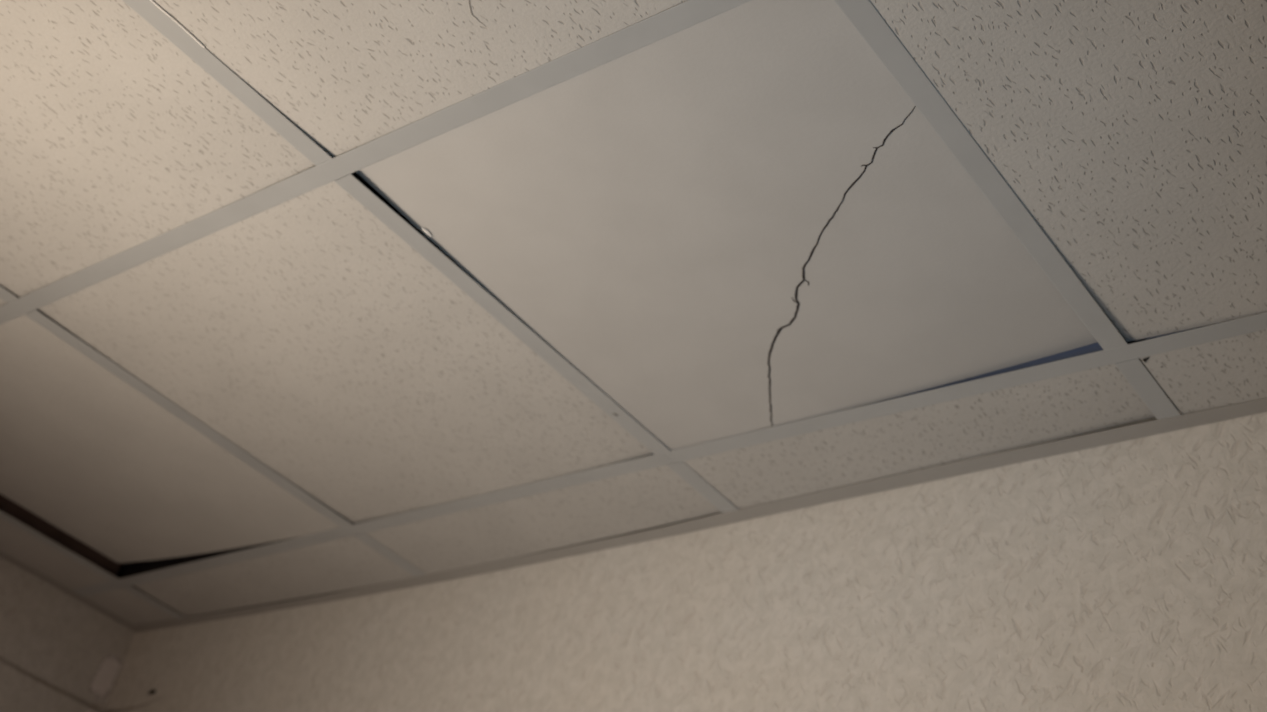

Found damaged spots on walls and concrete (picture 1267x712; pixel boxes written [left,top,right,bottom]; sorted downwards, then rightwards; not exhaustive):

crack [767,107,915,424]